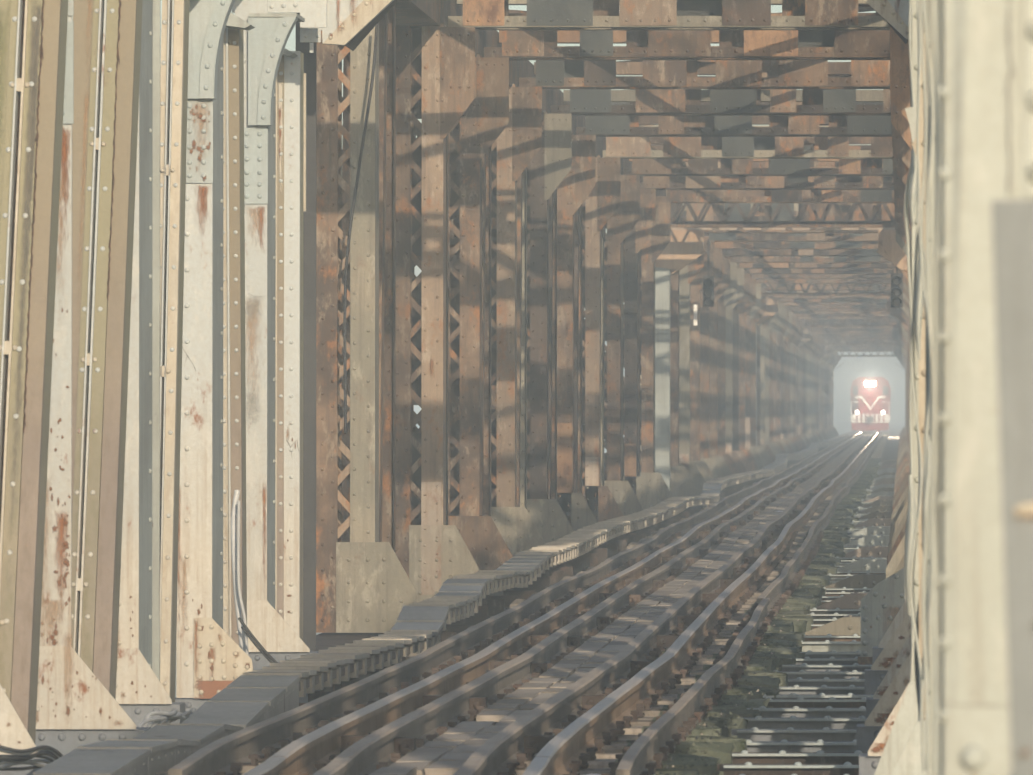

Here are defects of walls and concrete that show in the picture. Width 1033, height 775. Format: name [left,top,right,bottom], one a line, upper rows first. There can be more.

corrosion [59,130,69,225]
corrosion [190,106,211,225]
corrosion [253,208,264,242]
corrosion [36,487,97,721]
corrosion [178,492,233,699]